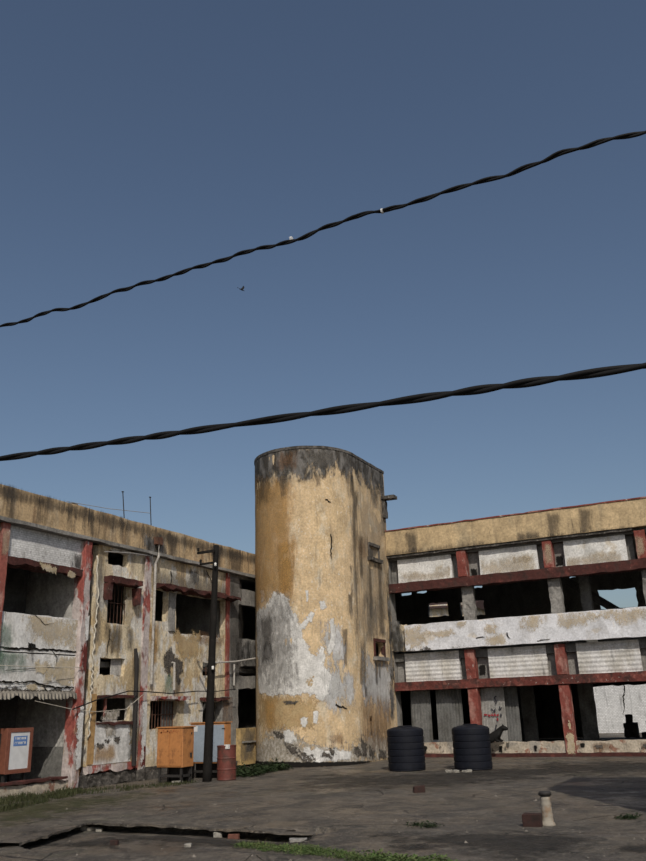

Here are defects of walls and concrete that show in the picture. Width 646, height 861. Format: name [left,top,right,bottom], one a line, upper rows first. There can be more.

peeling [0,616,89,692]
peeling [255,570,395,768]
peeling [405,621,466,651]
peeling [559,609,646,628]
peeling [75,706,84,770]
peeling [92,700,147,769]